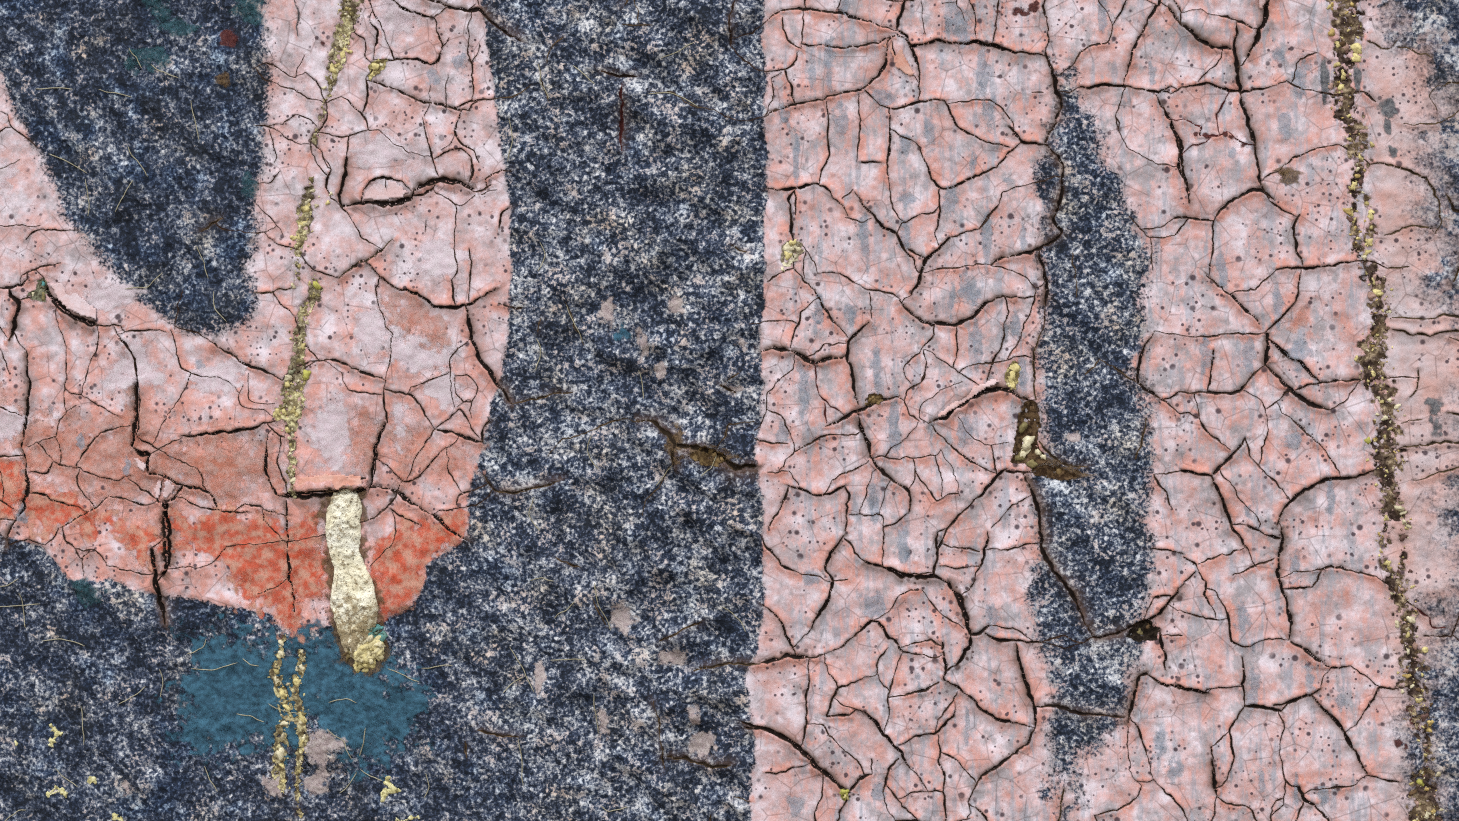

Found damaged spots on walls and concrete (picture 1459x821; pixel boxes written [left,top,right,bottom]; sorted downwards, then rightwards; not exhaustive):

peeling [26,277,96,320]
crack [0,0,573,624]
crack [548,0,1459,821]
spalling [1126,620,1160,642]
spalling [273,640,307,740]
spalling [275,747,285,768]